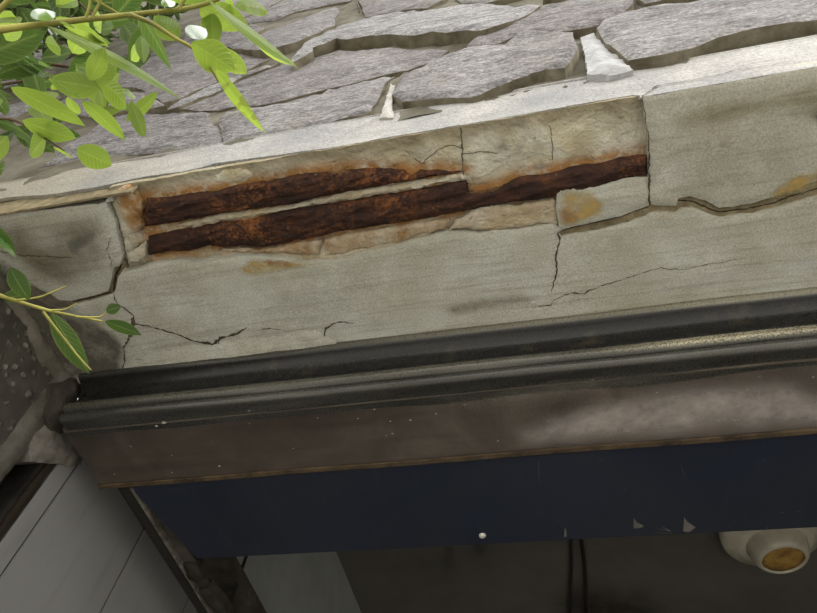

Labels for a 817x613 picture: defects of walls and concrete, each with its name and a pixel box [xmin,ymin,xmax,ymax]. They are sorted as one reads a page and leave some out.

crack [0,250,75,258]
crack [30,238,281,368]
spalling [107,96,647,266]
rust [145,154,648,255]
crack [538,61,817,307]